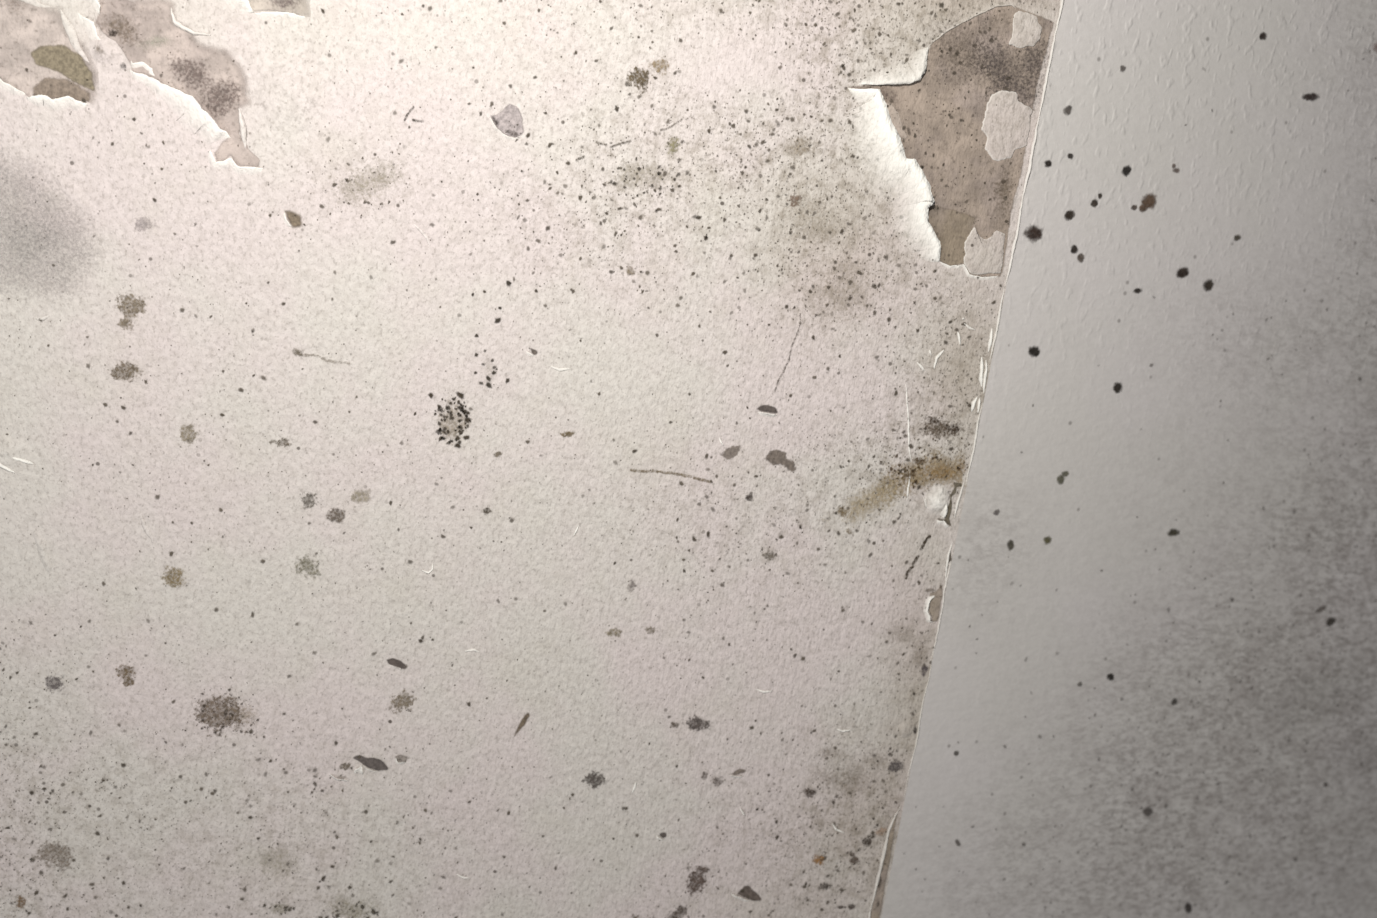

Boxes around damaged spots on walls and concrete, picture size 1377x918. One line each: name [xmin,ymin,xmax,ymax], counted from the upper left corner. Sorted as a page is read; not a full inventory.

peeling [0,0,263,175]
peeling [223,0,308,20]
peeling [845,0,1064,796]